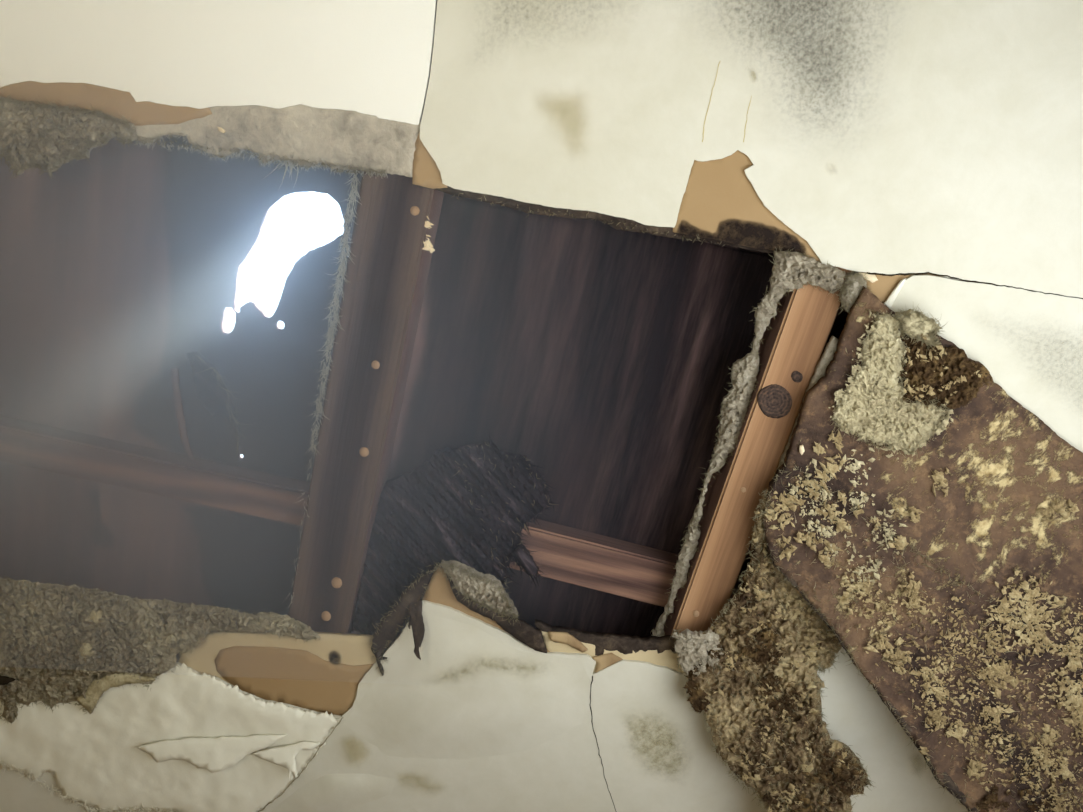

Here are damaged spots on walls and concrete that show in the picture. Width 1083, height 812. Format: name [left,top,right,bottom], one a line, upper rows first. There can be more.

peeling [0,81,212,126]
peeling [412,131,448,189]
peeling [422,216,435,253]
peeling [673,150,821,263]
crack [867,272,1083,299]
peeling [422,567,508,633]
peeling [178,631,376,716]
peeling [136,734,321,783]
crack [590,676,616,811]